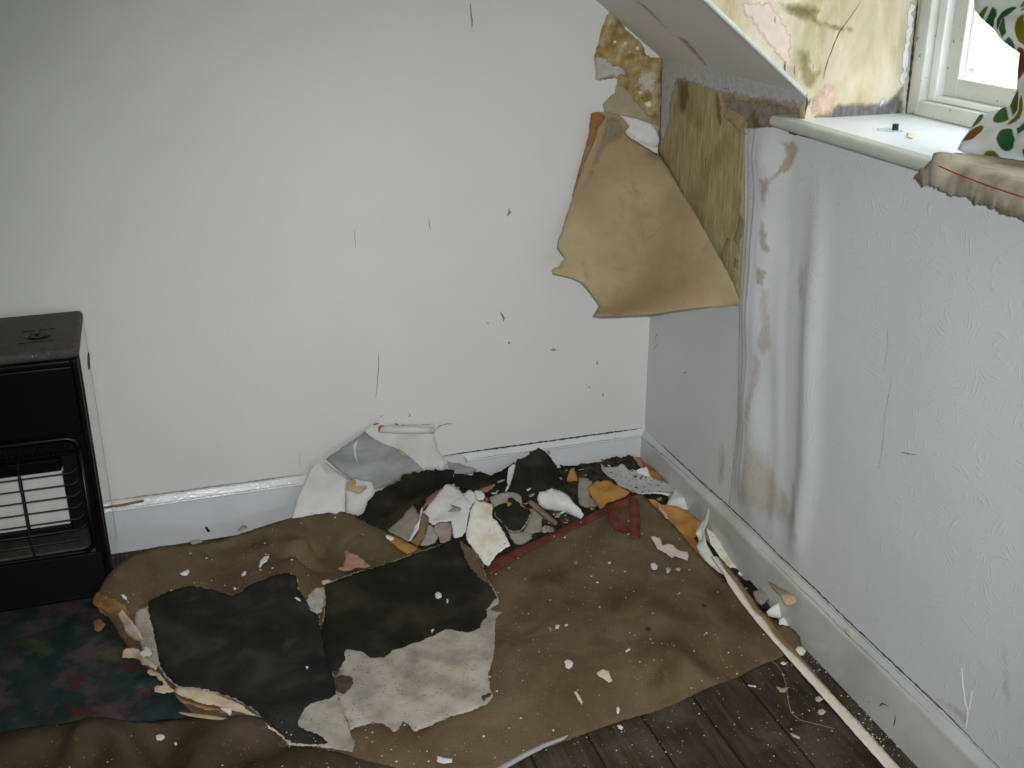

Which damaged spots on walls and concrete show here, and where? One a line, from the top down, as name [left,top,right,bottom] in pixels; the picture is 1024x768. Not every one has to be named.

peeling [900,2,916,84]
peeling [593,3,835,298]
damp [780,143,796,171]